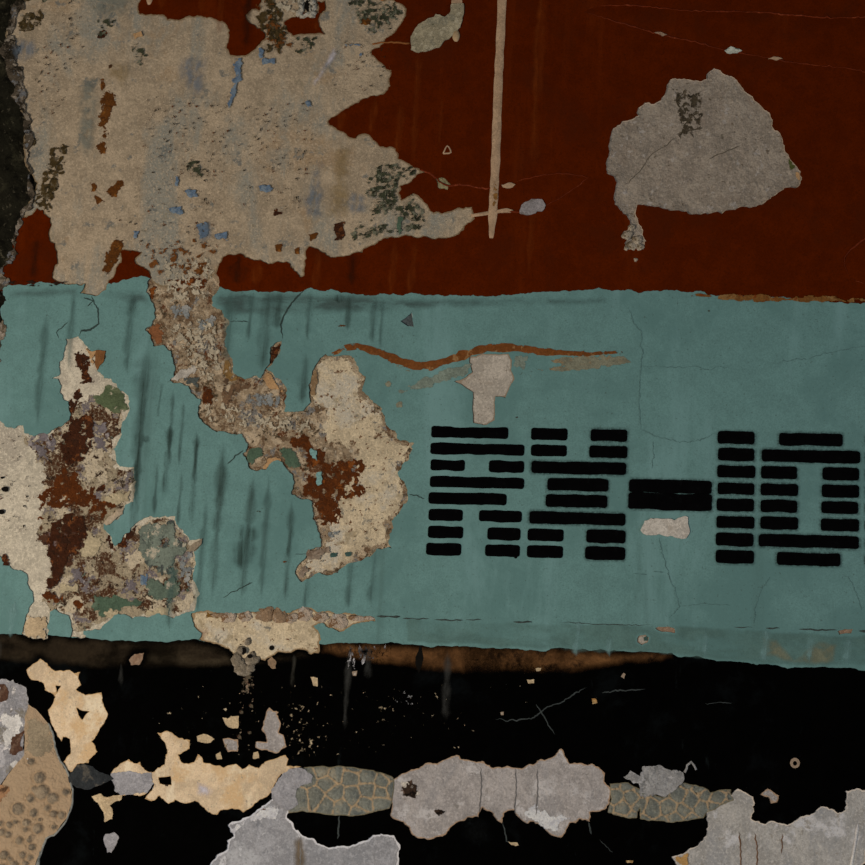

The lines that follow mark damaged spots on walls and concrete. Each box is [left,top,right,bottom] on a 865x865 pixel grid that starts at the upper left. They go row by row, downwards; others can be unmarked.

spalling [606,68,802,262]
peeling [0,0,475,582]
rust [332,343,631,408]
leakage [134,415,142,496]
peeling [0,337,375,669]
peeling [0,659,108,802]
peeling [91,708,400,865]
spalling [390,749,611,840]
spalling [672,788,865,865]